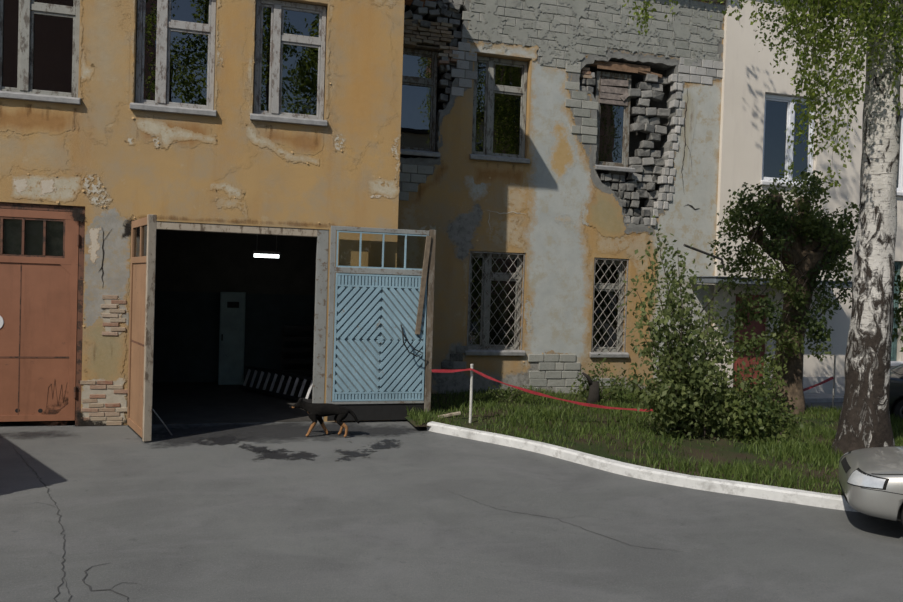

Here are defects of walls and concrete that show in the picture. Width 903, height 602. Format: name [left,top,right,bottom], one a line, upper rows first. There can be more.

spalling [10,173,155,336]
damp [74,0,131,146]
crack [99,228,112,288]
peeling [125,117,217,149]
peeling [245,0,320,166]
spalling [390,0,474,190]
flaking render [463,48,722,381]
flaking render [80,377,128,426]